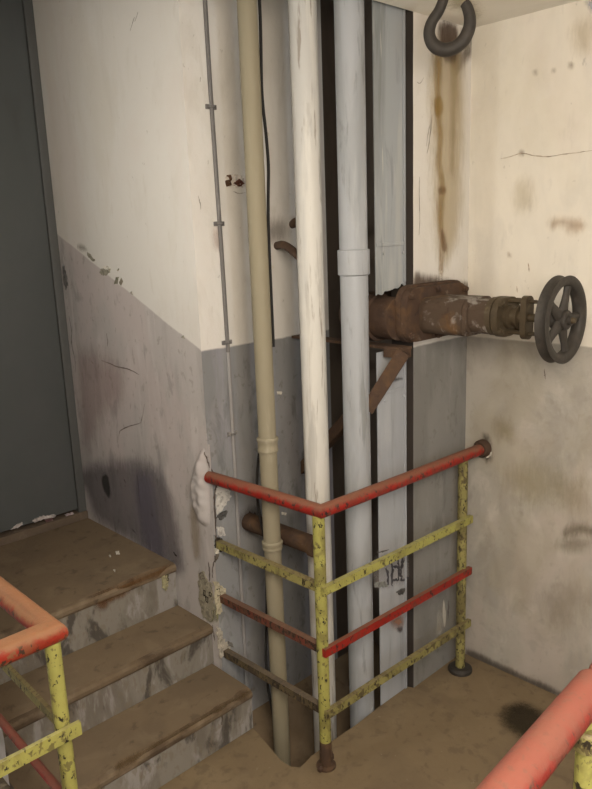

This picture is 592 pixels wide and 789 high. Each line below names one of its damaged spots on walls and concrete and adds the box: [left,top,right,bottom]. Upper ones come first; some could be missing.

corrosion [435,56,444,231]
crack [502,150,592,159]
peeling [99,265,123,285]
flaking render [197,571,234,659]